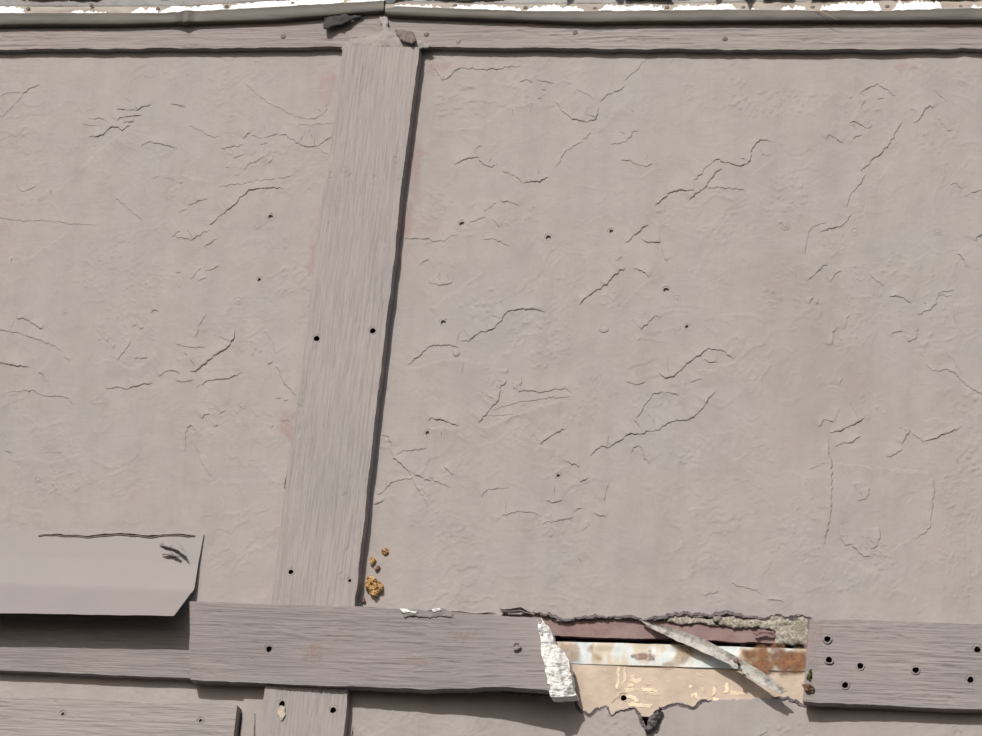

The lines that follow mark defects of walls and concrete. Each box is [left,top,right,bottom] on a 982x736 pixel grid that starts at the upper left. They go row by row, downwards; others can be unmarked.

crack [431,52,521,80]
crack [83,80,334,163]
crack [166,163,290,248]
crack [404,58,775,305]
crack [790,98,955,305]
crack [406,289,550,364]
crack [370,336,740,524]
crack [813,403,865,447]
spalling [538,610,812,668]
rust [742,643,805,673]
spalling [574,699,712,733]
spalling [771,696,808,707]